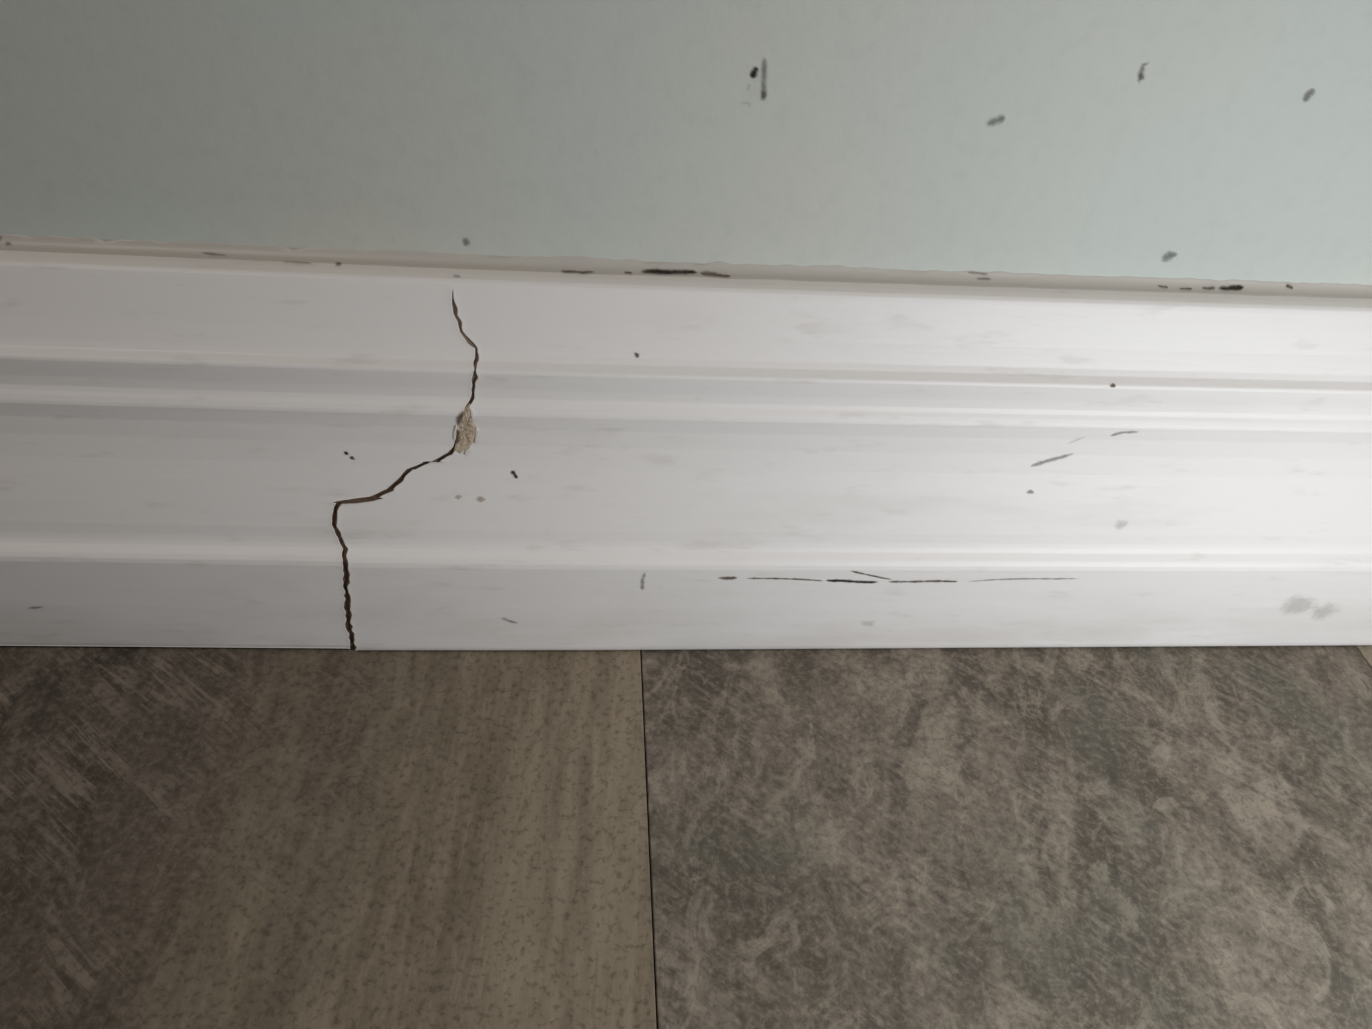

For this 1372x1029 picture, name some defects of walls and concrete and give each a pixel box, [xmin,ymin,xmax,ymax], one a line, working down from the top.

crack [332,291,479,649]